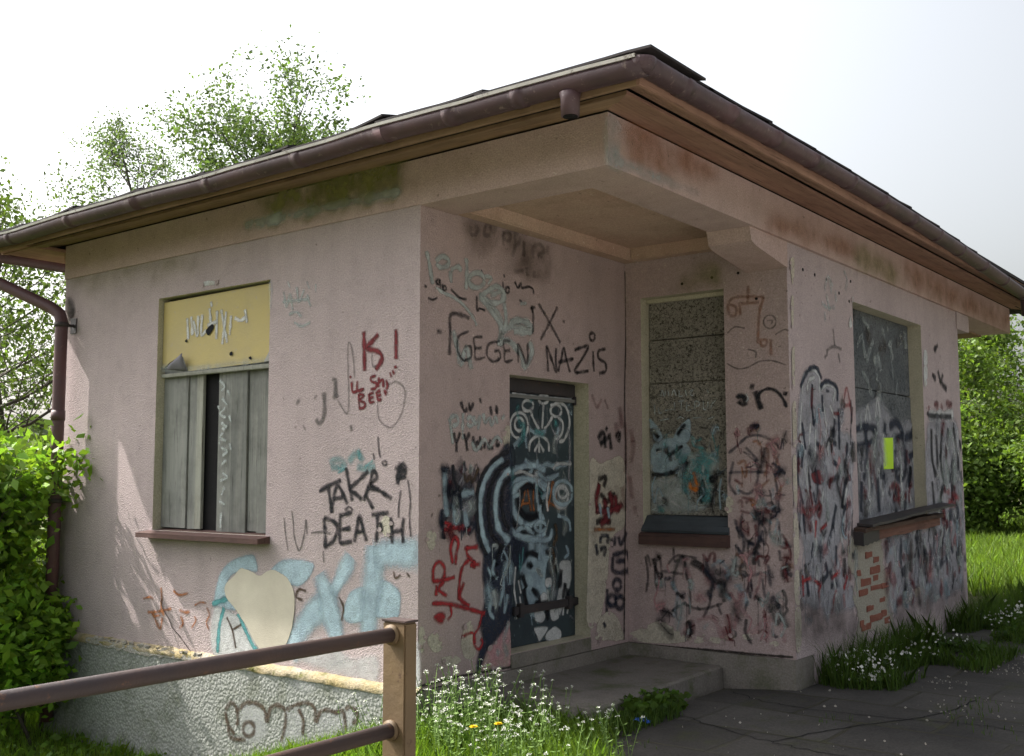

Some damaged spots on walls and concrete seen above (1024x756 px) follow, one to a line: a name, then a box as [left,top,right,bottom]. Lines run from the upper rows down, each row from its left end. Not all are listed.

leakage [245,149,400,228]
flaking render [848,537,921,644]